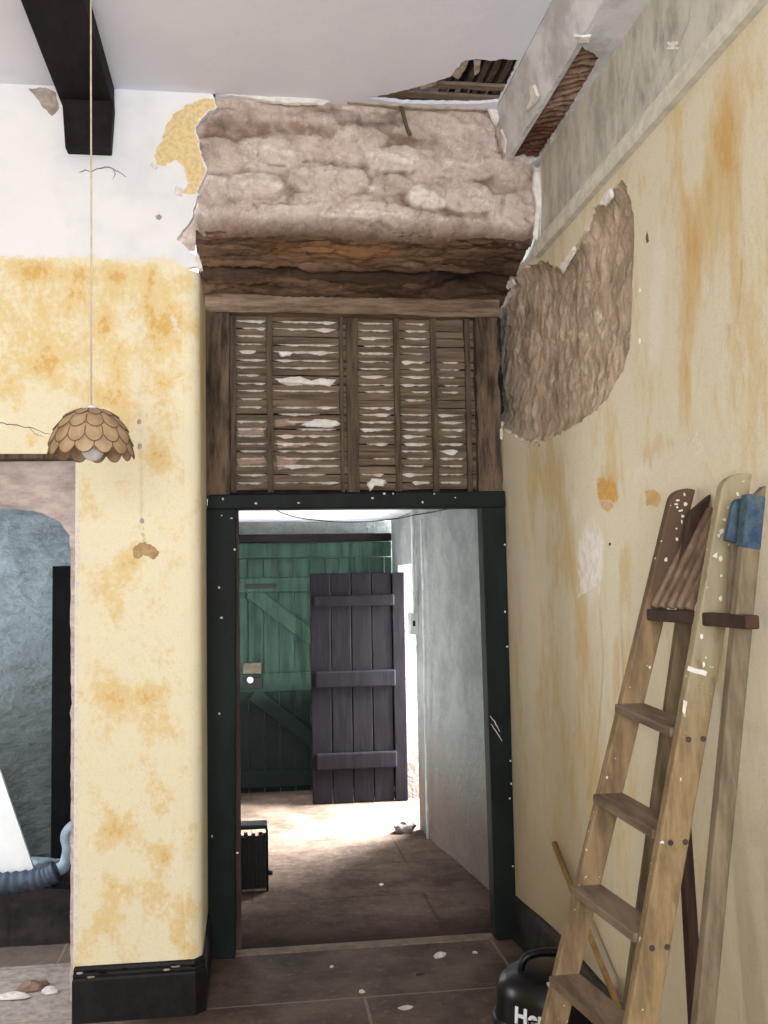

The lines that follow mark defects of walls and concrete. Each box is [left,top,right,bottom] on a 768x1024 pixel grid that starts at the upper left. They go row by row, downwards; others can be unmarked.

spalling [150,33,598,272]